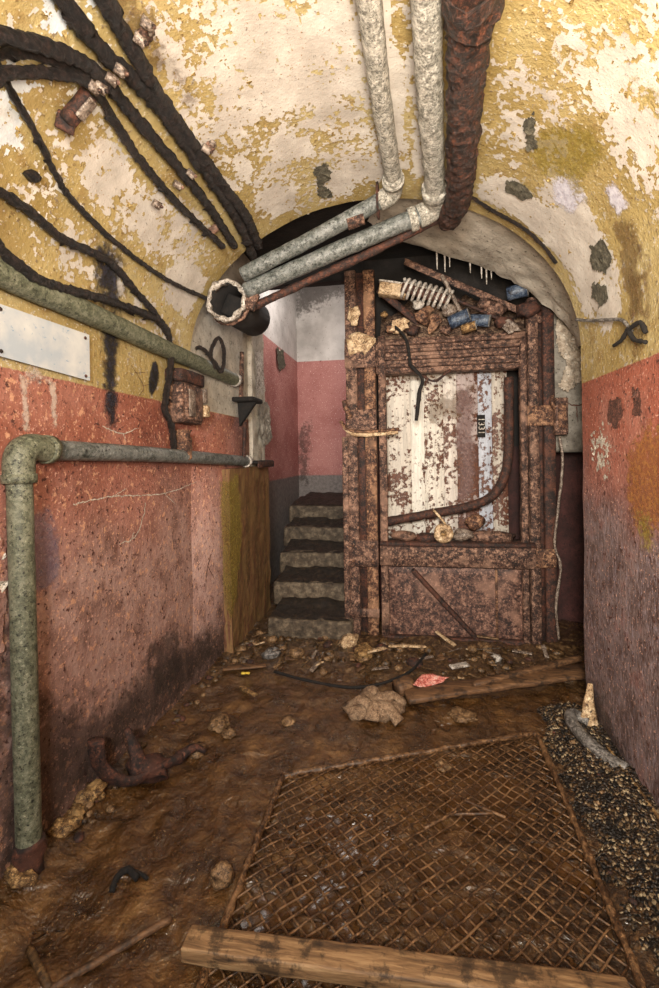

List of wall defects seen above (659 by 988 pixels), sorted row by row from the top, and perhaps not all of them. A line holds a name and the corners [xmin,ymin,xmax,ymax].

peeling [28,0,68,41]
peeling [0,80,216,340]
peeling [145,0,384,220]
peeling [476,0,659,337]
rust [456,390,476,499]
peeling [590,387,642,486]